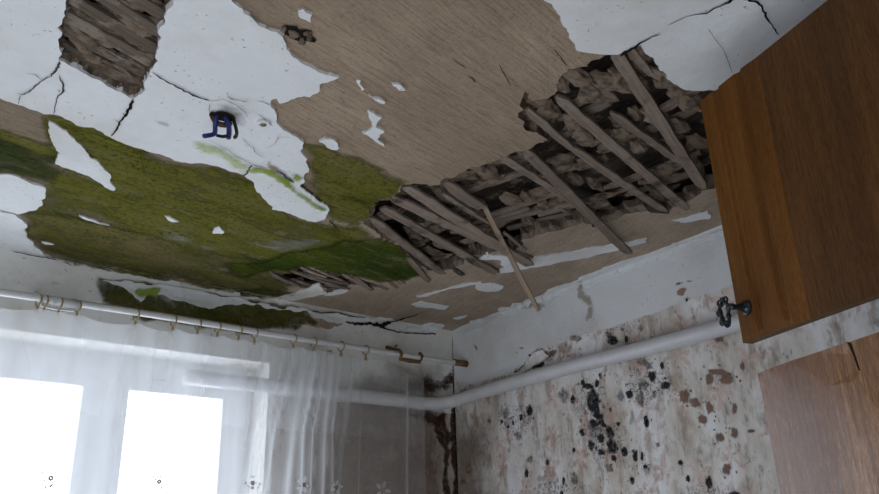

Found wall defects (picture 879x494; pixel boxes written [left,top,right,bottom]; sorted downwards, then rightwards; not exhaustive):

crack [619,0,779,71]
crack [18,62,65,112]
crack [111,100,134,136]
spalling [235,0,604,197]
spalling [0,98,120,230]
spalling [144,151,251,181]
spalling [34,188,724,339]
mould [606,321,643,345]
damp [360,367,454,397]
damp [323,403,484,494]
damp [523,455,587,494]
damp [560,359,754,494]